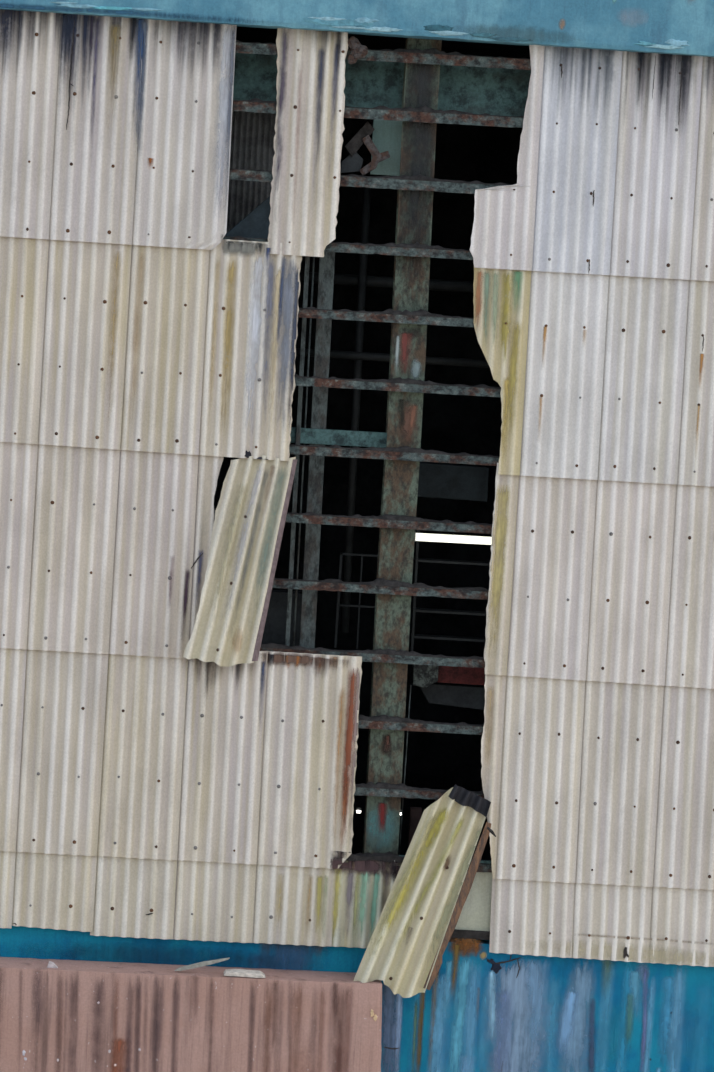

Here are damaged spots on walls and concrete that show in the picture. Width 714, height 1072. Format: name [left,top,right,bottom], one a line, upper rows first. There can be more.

leakage [0,4,239,189]
rust [348,36,368,64]
rust [396,329,420,377]
rust [475,271,521,419]
rust [491,489,508,619]
rust [267,653,360,821]
rust [413,971,439,1071]
rust [451,938,486,987]